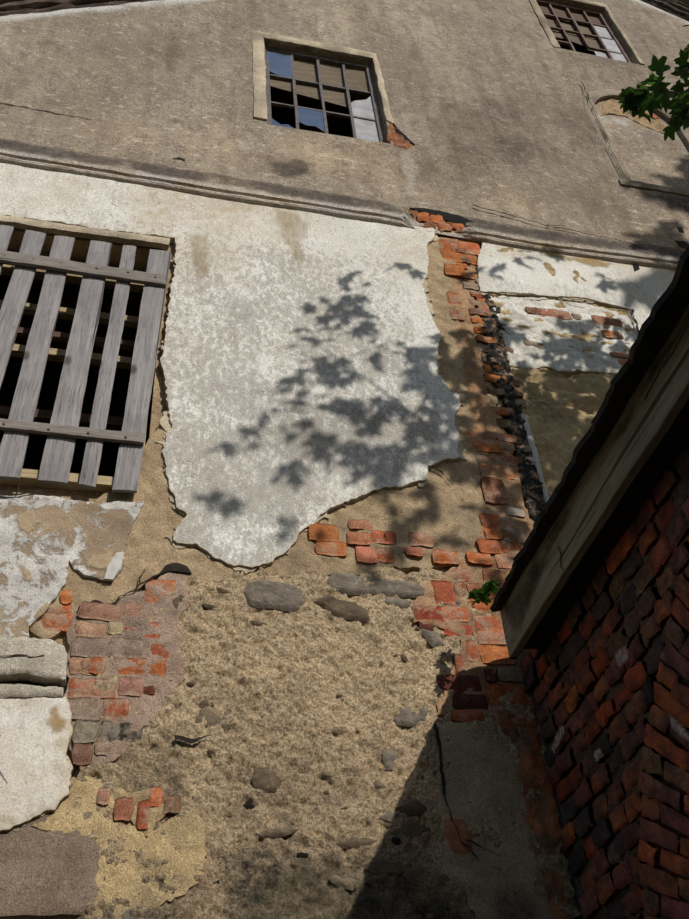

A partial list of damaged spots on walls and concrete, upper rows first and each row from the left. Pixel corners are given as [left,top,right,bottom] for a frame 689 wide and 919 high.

flaking render [386,123,415,149]
spalling [409,208,474,227]
flaking render [0,236,637,919]
crack [434,723,500,860]